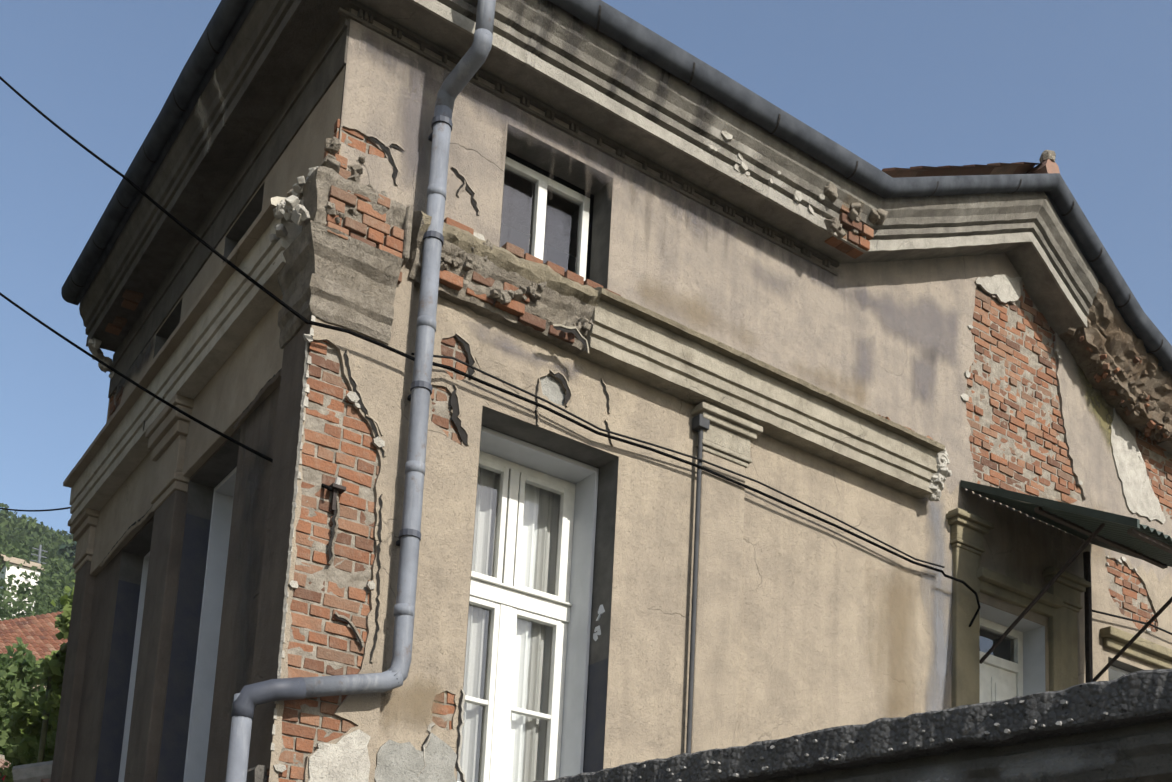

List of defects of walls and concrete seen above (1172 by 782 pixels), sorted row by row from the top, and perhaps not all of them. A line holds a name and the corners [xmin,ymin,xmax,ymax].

spalling [269,119,404,258]
crack [367,134,405,185]
crack [451,166,481,215]
flaking render [430,337,469,445]
flaking render [540,369,573,407]
crack [601,378,614,446]
leakage [862,293,956,396]
flaking render [960,274,1083,504]
flaking render [280,314,385,678]
flaking render [1110,408,1172,524]
flaking render [1105,556,1157,633]
flaking render [267,695,357,782]